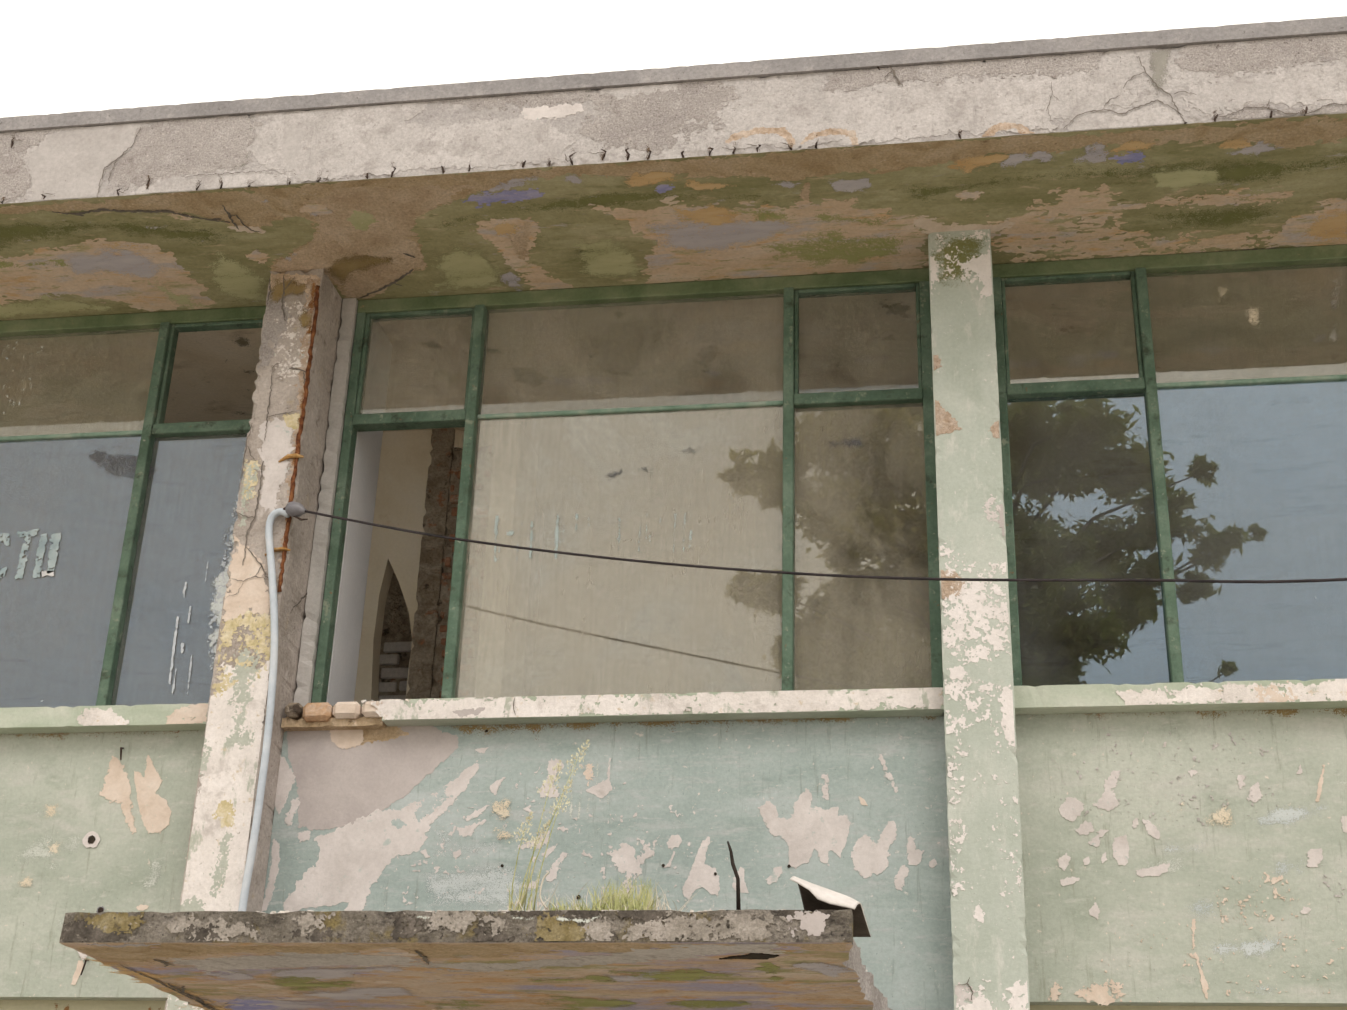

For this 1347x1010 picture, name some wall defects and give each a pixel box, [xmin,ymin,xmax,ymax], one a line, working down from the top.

crack [1047,56,1196,128]
crack [1225,101,1347,118]
crack [52,127,284,232]
spalling [0,80,1347,527]
flaking render [982,494,1005,536]
peeling [71,516,857,1010]
flaking render [275,543,1015,930]
peeling [992,796,1022,908]
peeling [1058,727,1278,886]
peeling [1115,679,1347,705]
peeling [1307,848,1344,902]
peeling [1214,872,1345,996]